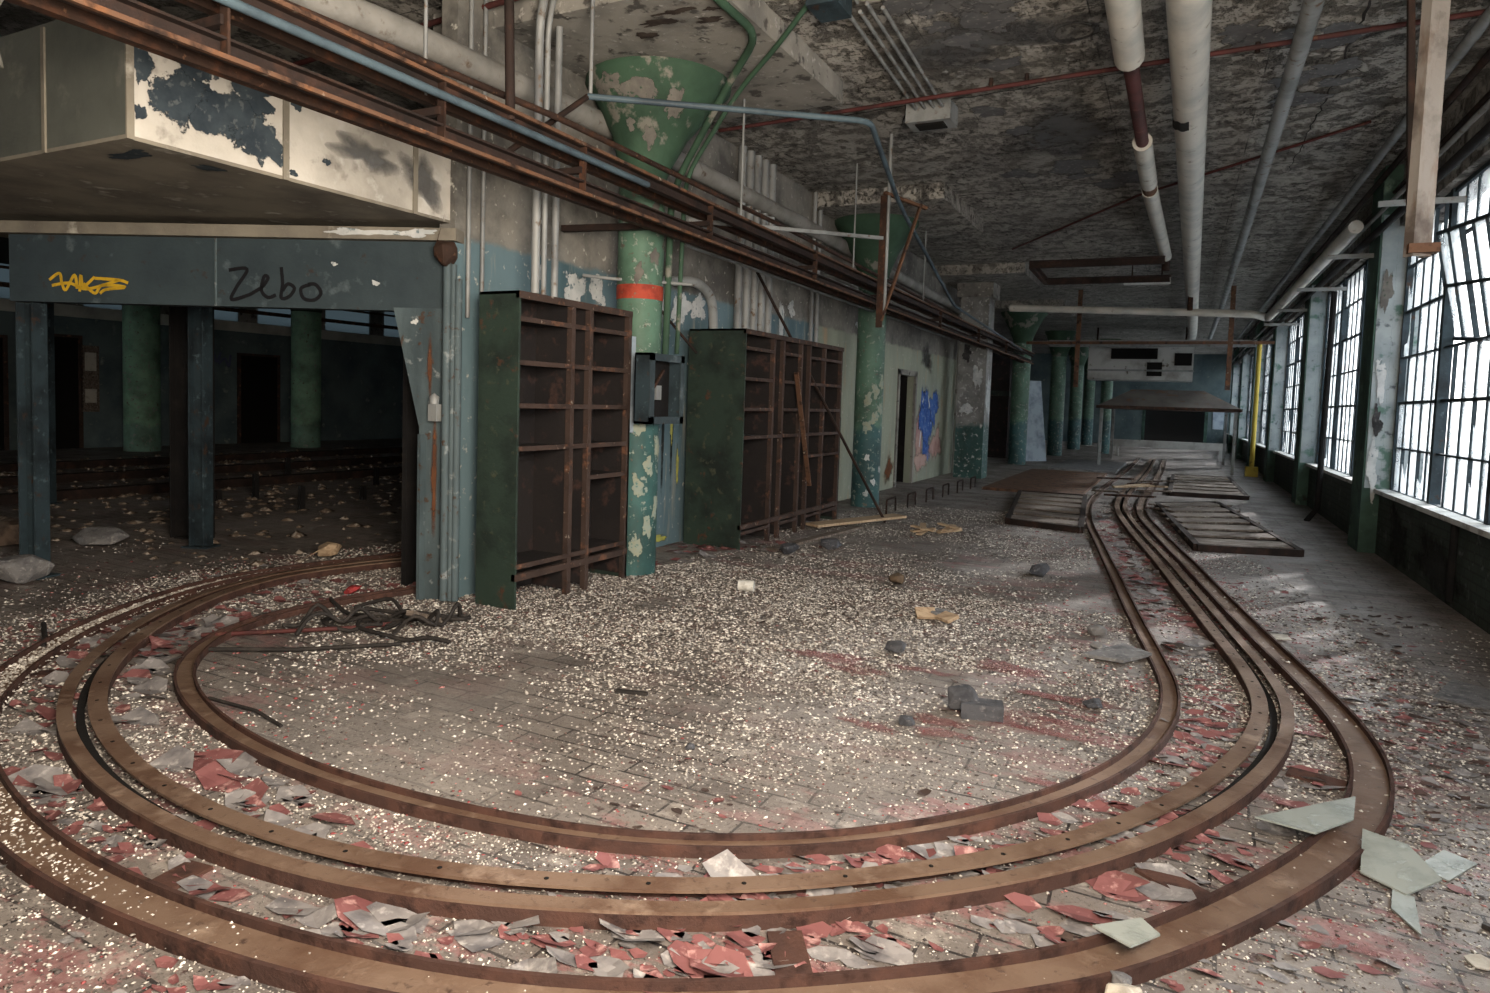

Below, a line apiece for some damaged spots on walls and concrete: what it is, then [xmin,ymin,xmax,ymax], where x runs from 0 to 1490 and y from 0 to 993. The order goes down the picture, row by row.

peeling [134,47,302,177]
peeling [595,71,685,152]
peeling [107,149,152,160]
peeling [564,271,606,306]
peeling [662,292,706,324]
peeling [628,424,679,557]